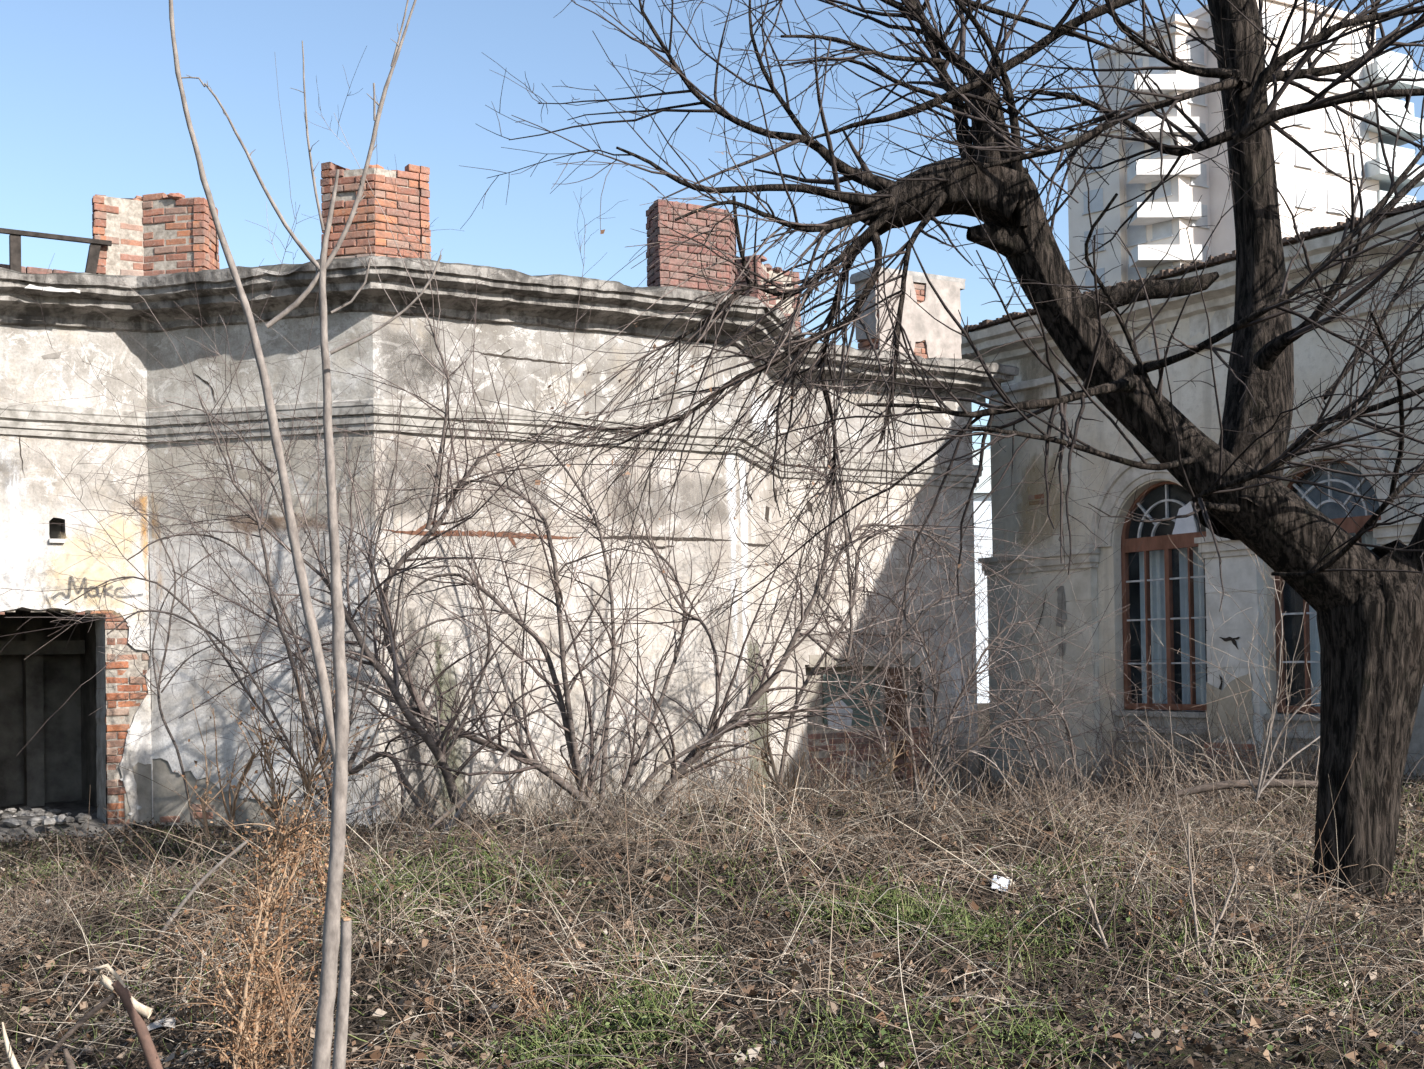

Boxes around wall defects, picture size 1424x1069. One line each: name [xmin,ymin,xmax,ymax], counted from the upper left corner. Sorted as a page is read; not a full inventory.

spalling [0,597,306,832]
peeling [1204,673,1256,771]